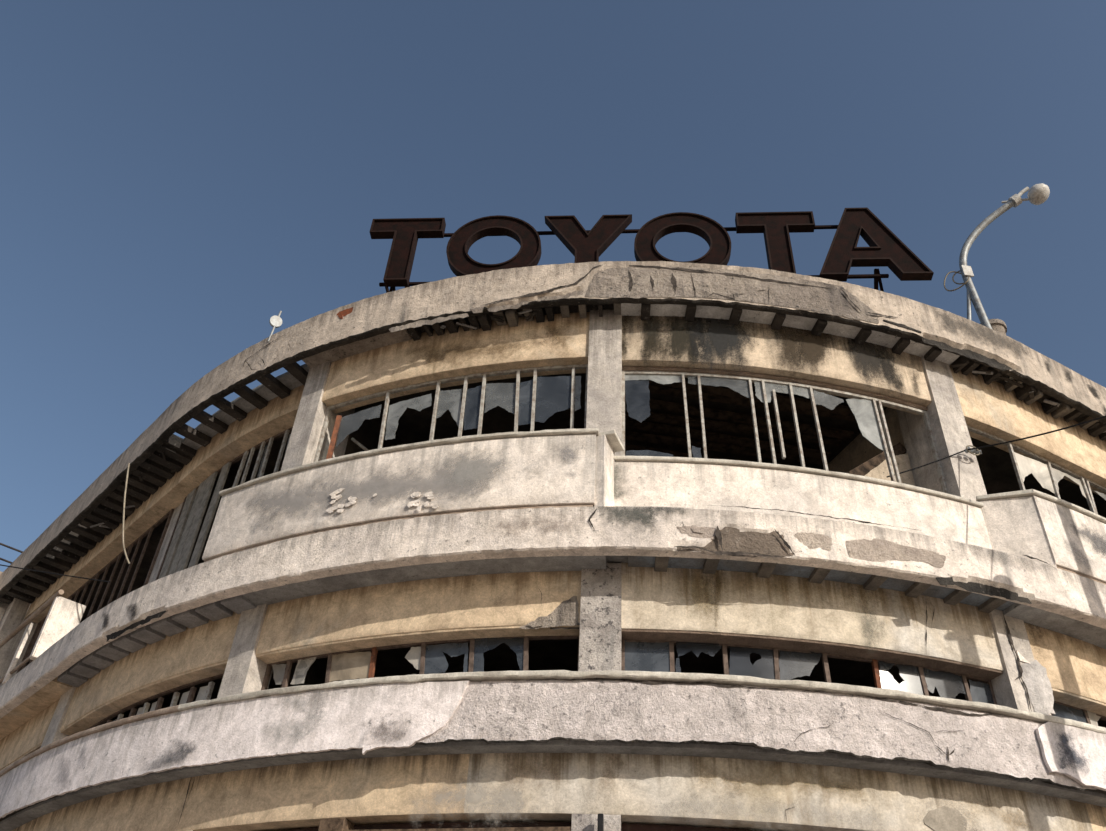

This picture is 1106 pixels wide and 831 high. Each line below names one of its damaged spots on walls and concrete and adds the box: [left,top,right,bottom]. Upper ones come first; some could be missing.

crack [484,265,602,305]
crack [629,265,898,318]
water stain [622,315,752,369]
water stain [771,326,918,390]
spalling [677,525,832,558]
spalling [846,538,1032,604]
spalling [519,596,580,629]
crack [926,606,934,655]
crack [526,614,1032,761]
flaking render [0,680,470,818]
flaking render [1035,722,1106,791]
water stain [1060,734,1085,769]